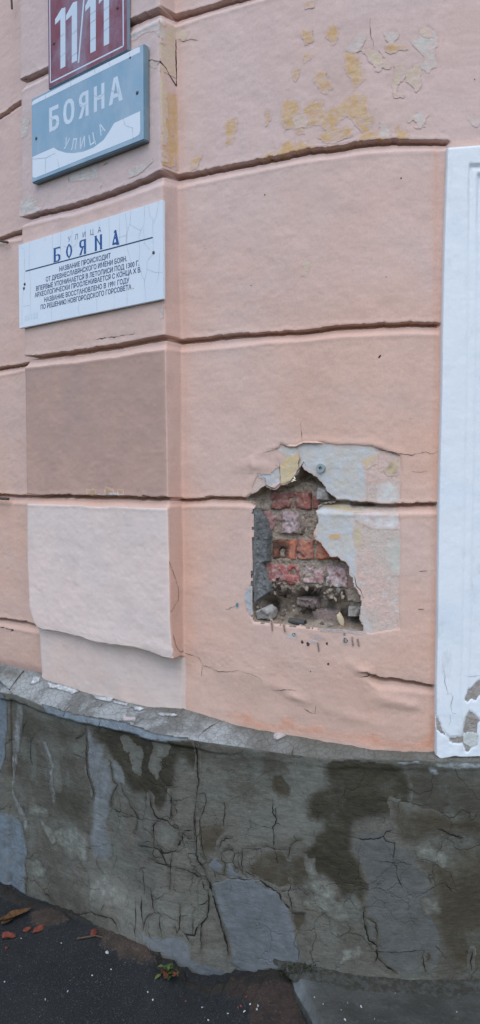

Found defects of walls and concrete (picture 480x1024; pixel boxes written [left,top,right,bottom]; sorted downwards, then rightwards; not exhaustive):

peeling [249,24,429,165]
peeling [244,441,401,645]
peeling [396,680,480,775]
crack [24,703,304,963]
leakage [246,759,480,976]
crack [359,830,402,886]
crack [360,904,440,977]
crack [467,946,476,974]